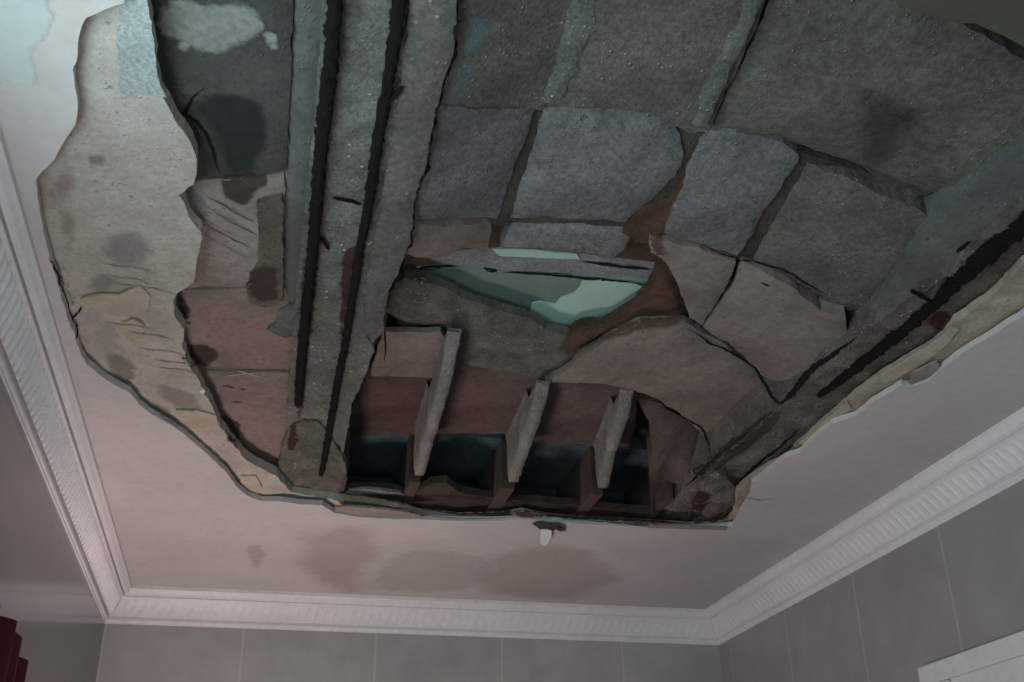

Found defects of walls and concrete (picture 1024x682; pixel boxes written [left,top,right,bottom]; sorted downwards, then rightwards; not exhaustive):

crack [182,88,219,172]
water stain [199,96,267,205]
flaking render [38,0,1024,546]
crack [704,246,825,306]